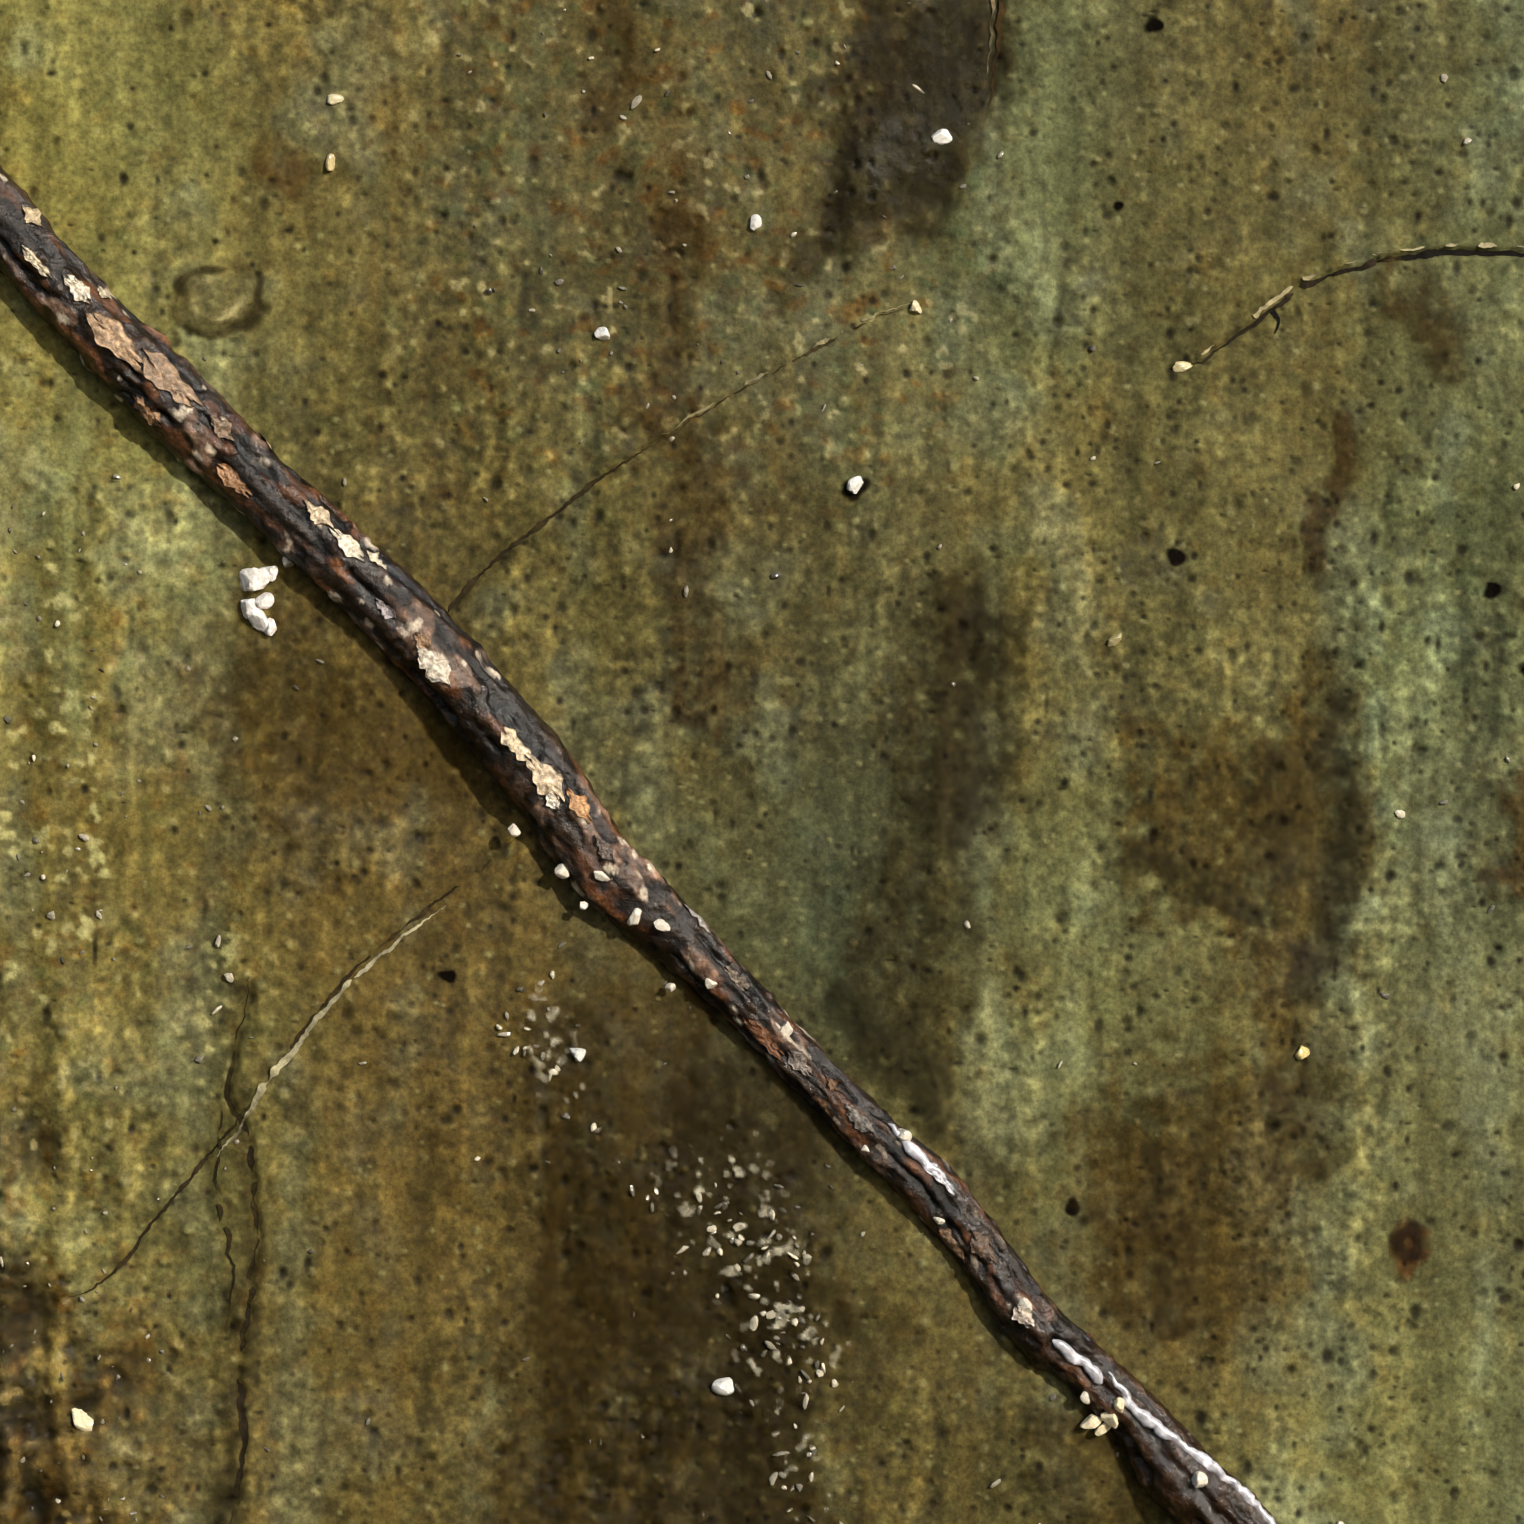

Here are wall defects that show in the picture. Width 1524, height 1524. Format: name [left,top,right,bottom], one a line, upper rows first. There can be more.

damp [785,0,1015,280]
crack [1168,242,1524,369]
corrosion [1300,411,1356,573]
damp [829,584,1029,1187]
damp [1064,658,1375,1344]
crack [67,843,510,1524]
corrosion [1391,1221,1429,1277]